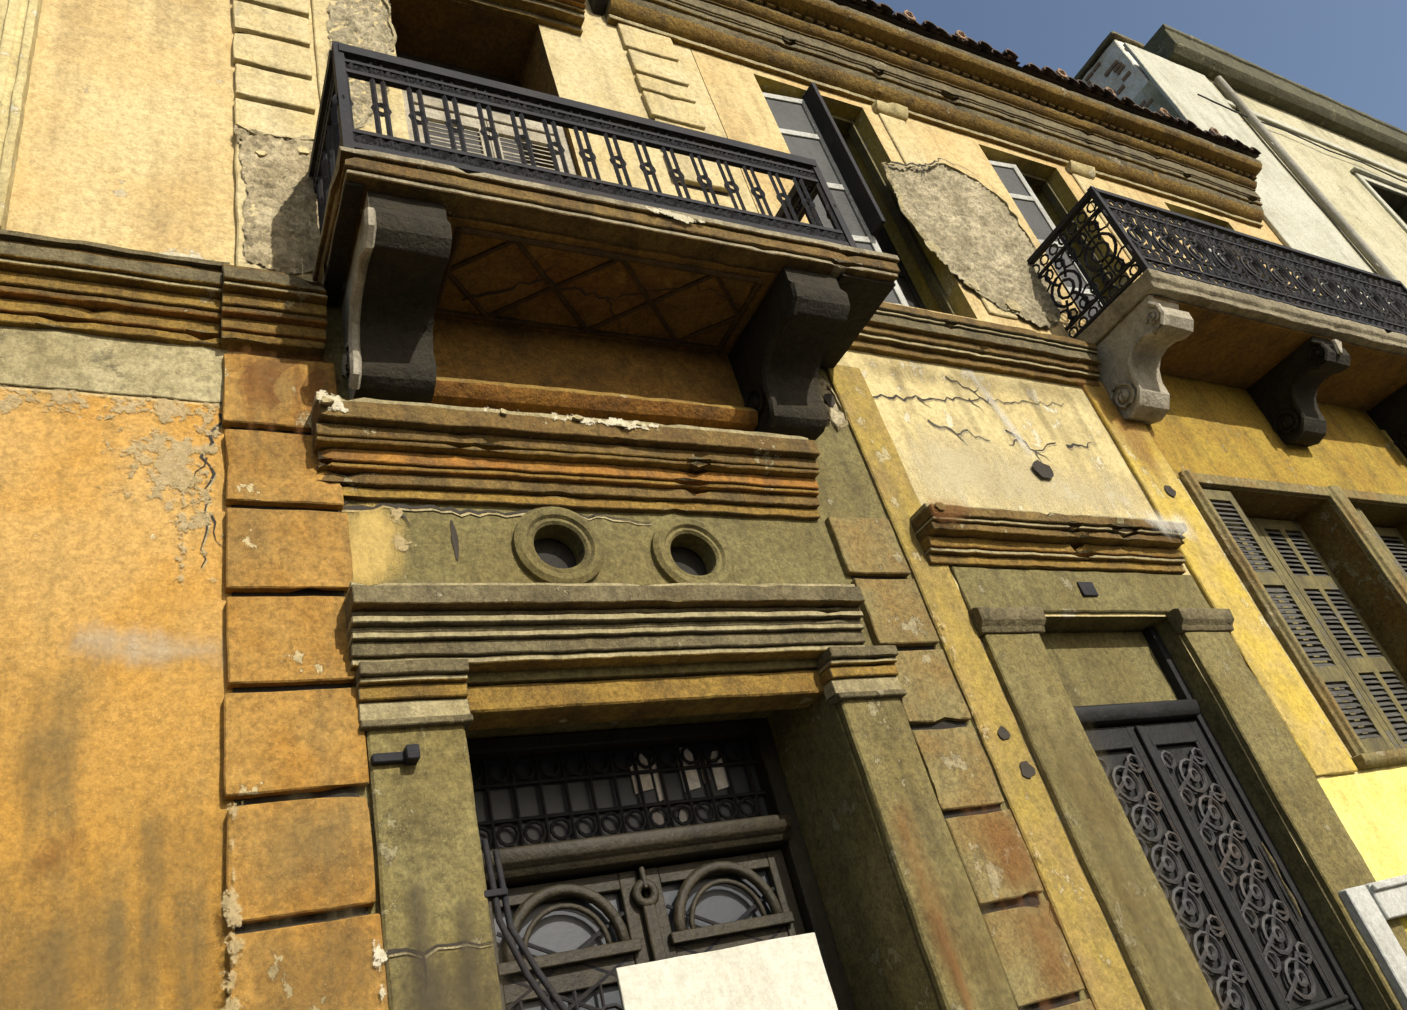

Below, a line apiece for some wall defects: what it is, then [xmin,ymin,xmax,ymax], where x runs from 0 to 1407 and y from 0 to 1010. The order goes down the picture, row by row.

flaking render [326,0,397,60]
flaking render [349,78,390,129]
flaking render [233,123,320,274]
flaking render [881,162,1064,328]
peeling [0,385,230,585]
crack [873,376,1091,462]